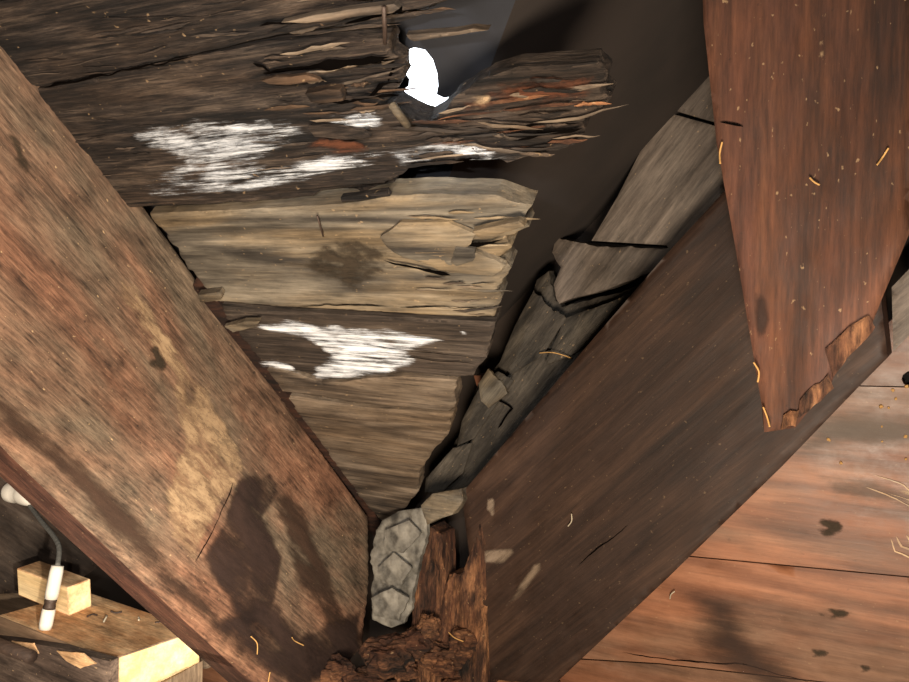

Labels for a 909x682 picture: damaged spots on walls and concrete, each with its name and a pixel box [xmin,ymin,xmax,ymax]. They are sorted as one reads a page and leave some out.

crack [44,56,193,88]
peeling [308,124,372,140]
water stain [345,113,379,127]
water stain [10,136,28,172]
water stain [140,123,362,192]
water stain [426,145,491,159]
peeling [451,246,476,266]
water stain [260,323,435,378]
water stain [0,403,359,682]